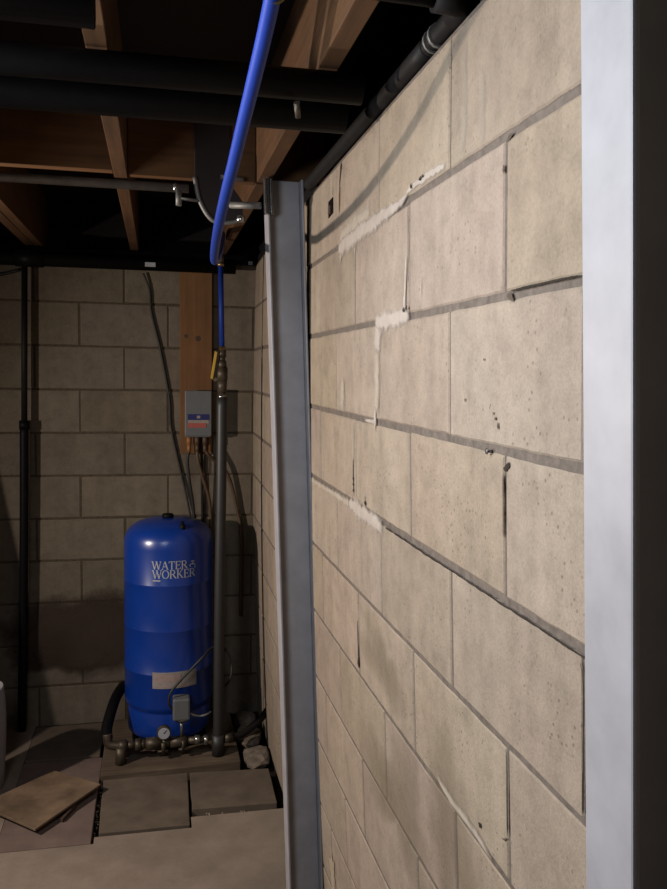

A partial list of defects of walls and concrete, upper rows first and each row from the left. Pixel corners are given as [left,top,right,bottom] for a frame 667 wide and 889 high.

damp [365,351,379,429]
crack [501,753,509,841]